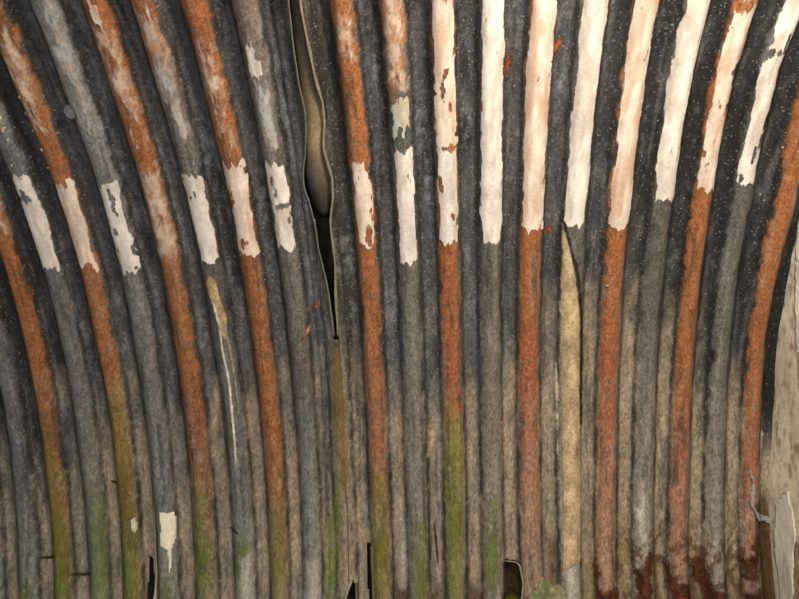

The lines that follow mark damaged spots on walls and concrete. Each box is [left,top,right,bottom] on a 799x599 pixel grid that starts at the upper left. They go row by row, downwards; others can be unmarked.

peeling [181,174,219,265]
peeling [222,158,260,258]
peeling [479,0,505,244]
peeling [521,0,557,235]
peeling [608,0,660,231]
peeling [655,0,710,203]
peeling [697,0,757,194]
peeling [736,0,799,186]
corrosion [592,559,617,599]
corrosion [633,552,654,599]
corrosion [661,556,726,599]
corrosion [737,537,761,599]